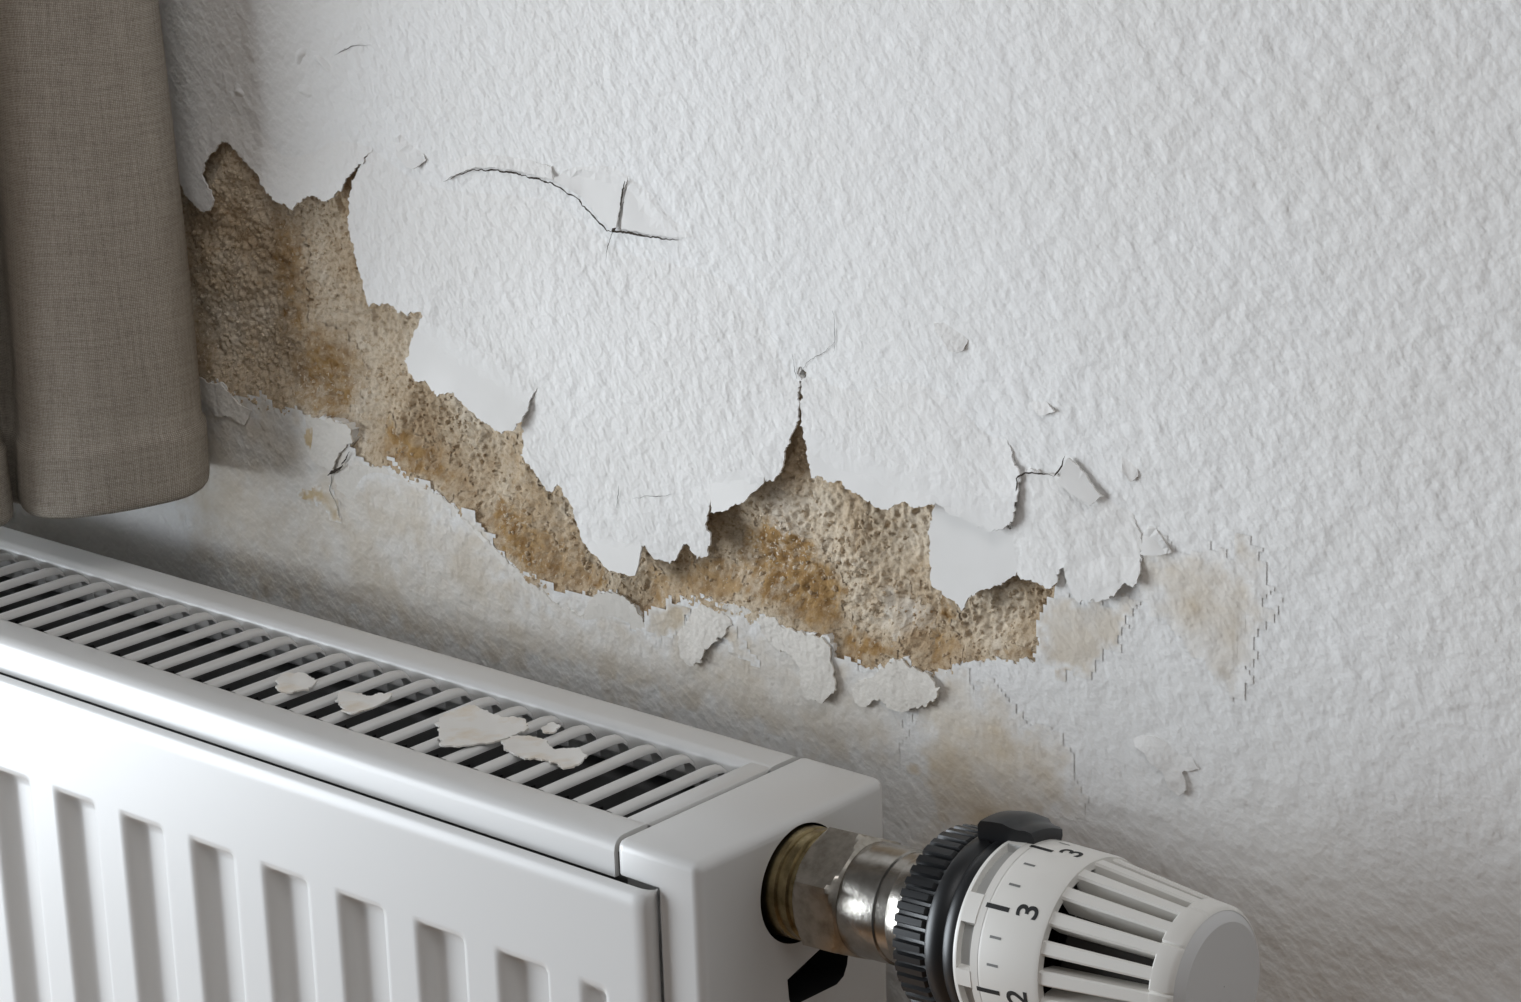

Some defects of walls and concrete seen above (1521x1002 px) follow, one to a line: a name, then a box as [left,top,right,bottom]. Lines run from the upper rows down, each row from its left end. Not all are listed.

crack [443,169,675,256]
damp [186,240,228,381]
peeling [175,116,1172,712]
damp [174,390,1091,850]
peeling [1133,735,1199,796]